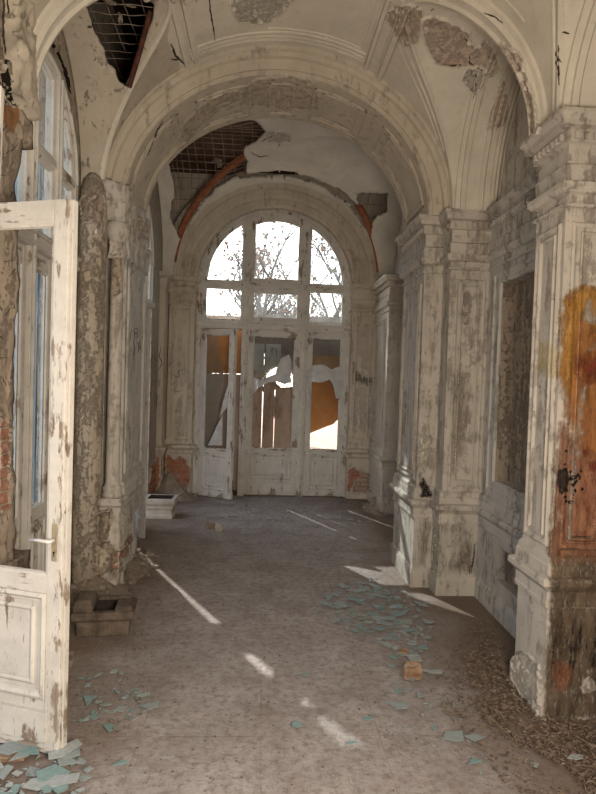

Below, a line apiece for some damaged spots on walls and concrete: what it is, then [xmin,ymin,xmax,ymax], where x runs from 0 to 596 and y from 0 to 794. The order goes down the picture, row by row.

spalling [89,0,154,88]
spalling [228,0,295,26]
spalling [386,2,541,136]
flaking render [0,415,14,517]
flaking render [92,453,192,576]
flaking render [346,465,371,494]
leakage [544,524,596,719]